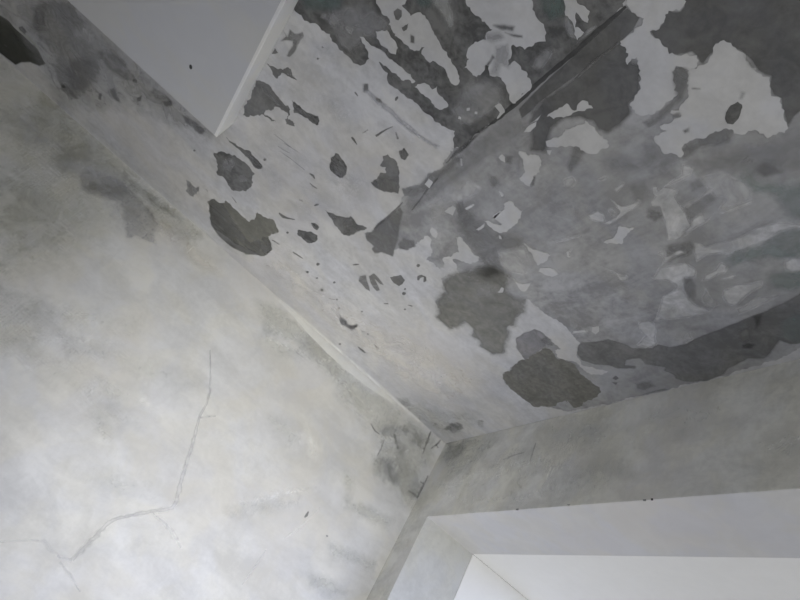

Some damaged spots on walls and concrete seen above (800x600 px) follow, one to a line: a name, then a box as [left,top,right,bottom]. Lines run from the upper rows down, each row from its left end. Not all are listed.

peeling [0,16,45,66]
peeling [243,64,319,126]
peeling [283,30,303,56]
peeling [186,137,319,256]
peeling [294,0,800,412]
crack [72,362,211,560]